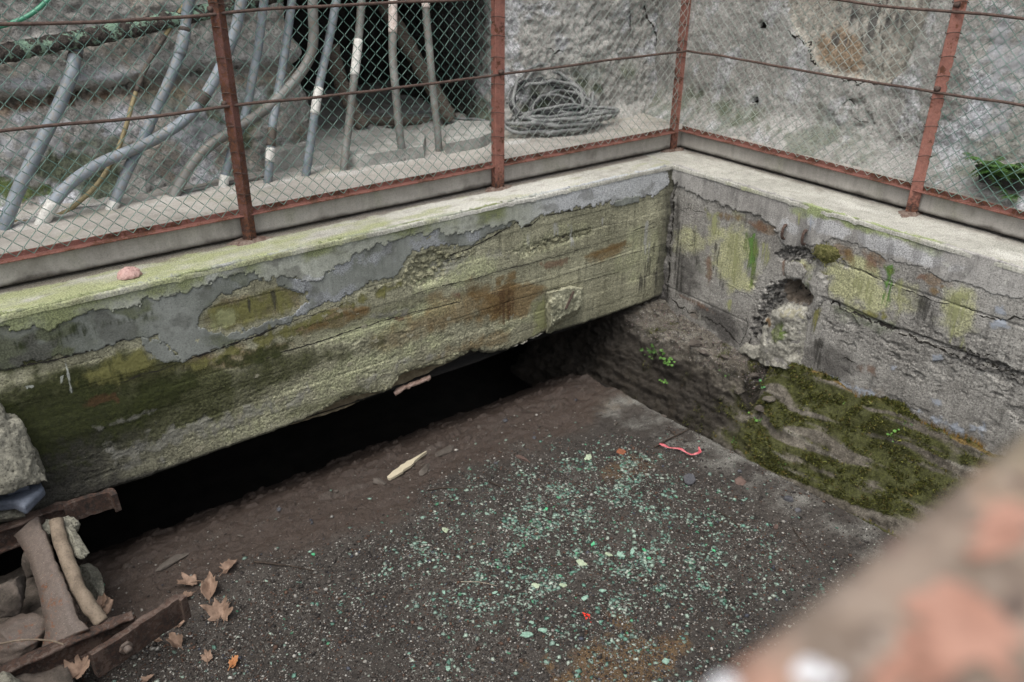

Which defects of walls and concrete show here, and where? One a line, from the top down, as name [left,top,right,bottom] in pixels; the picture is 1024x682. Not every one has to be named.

peeling [0,163,1024,371]
damp [710,214,769,288]
damp [853,265,903,306]
crack [843,260,1024,321]
spalling [321,339,478,411]
damp [814,338,875,398]
crack [829,299,1024,386]
damp [918,400,985,448]